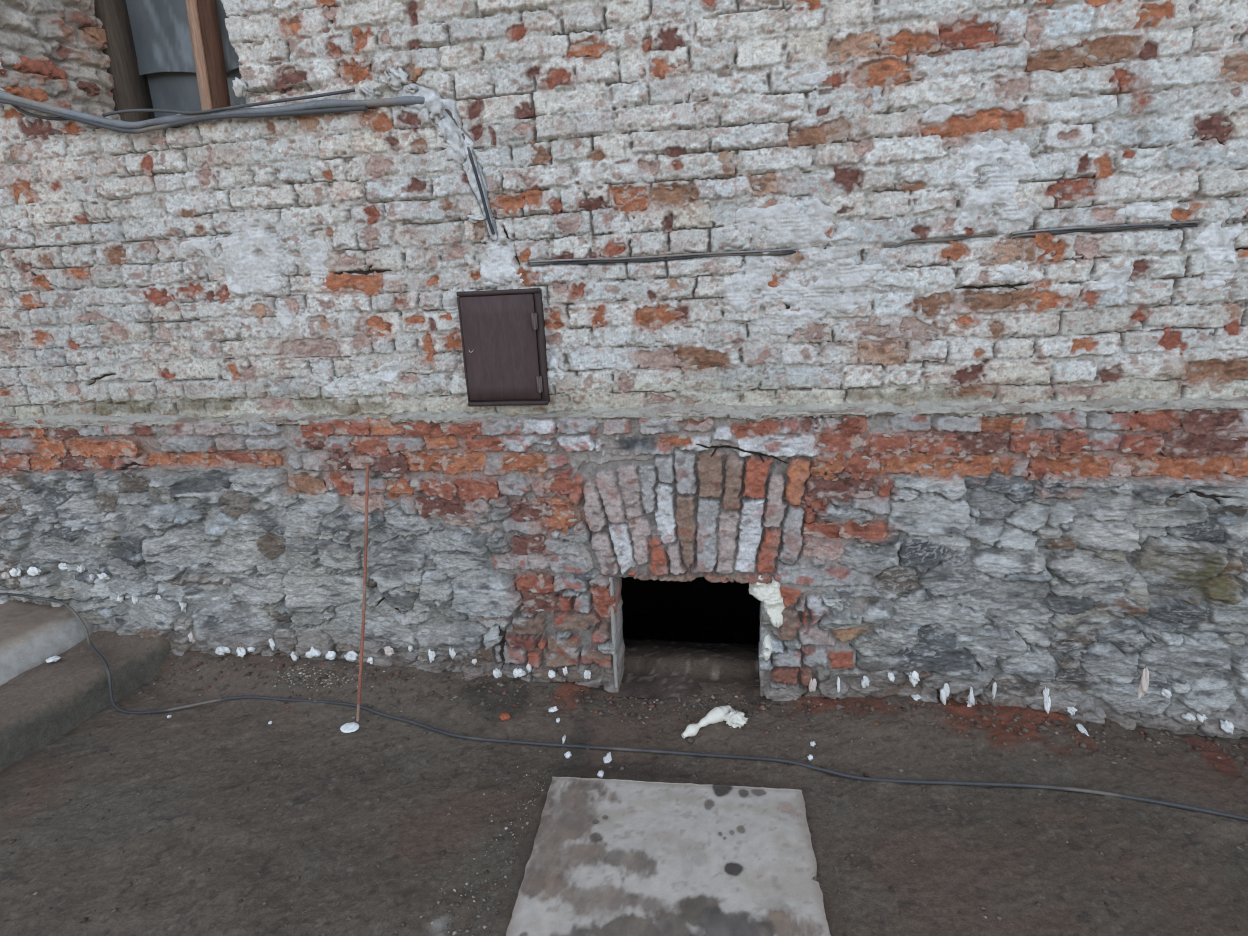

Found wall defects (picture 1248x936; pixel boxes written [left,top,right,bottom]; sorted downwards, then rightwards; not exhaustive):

spalling [3,55,101,141]
spalling [920,0,1174,148]
spalling [282,205,462,361]
spalling [0,419,281,473]
spalling [286,417,582,555]
spalling [660,418,699,447]
crack [696,444,786,463]
spalling [731,419,782,438]